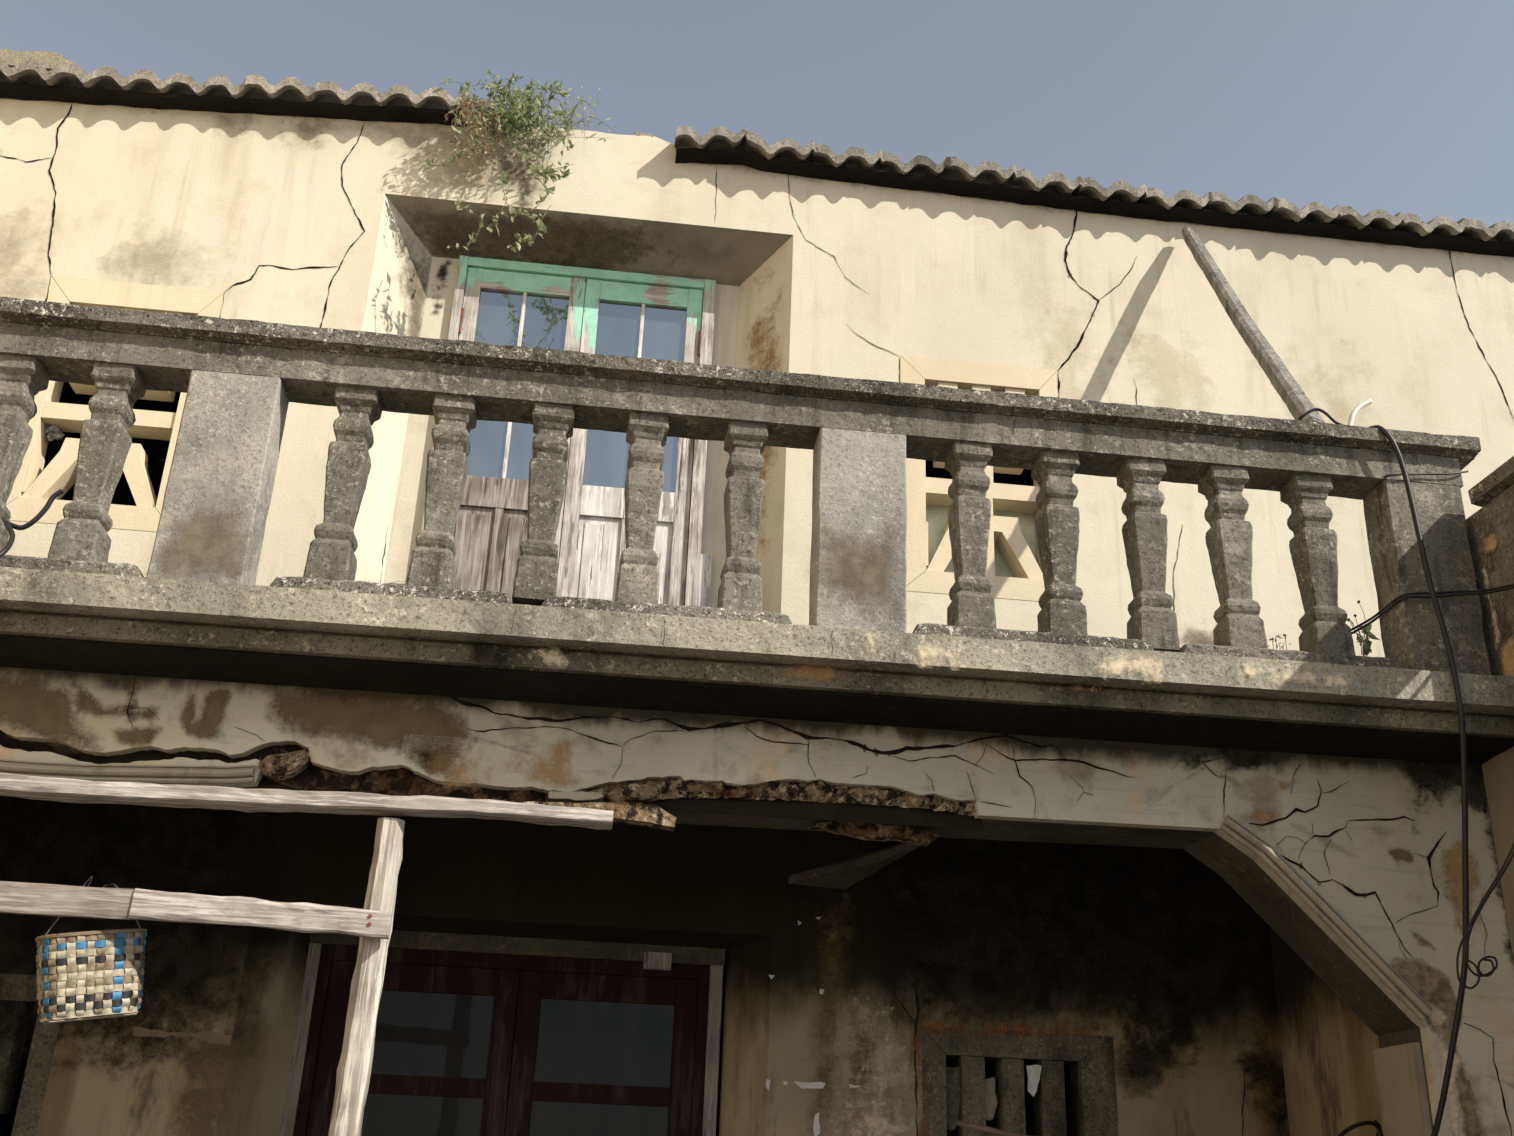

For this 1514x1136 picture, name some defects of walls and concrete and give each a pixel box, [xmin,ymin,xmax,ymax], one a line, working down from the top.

crack [0,104,72,301]
crack [219,124,365,328]
corrosion [750,316,776,370]
crack [1058,210,1135,392]
crack [1449,251,1514,418]
leakage [181,690,230,738]
leakage [270,691,467,775]
spalling [257,746,976,889]
crack [448,696,1135,814]
crack [1175,757,1487,960]
peeling [766,1079,825,1090]